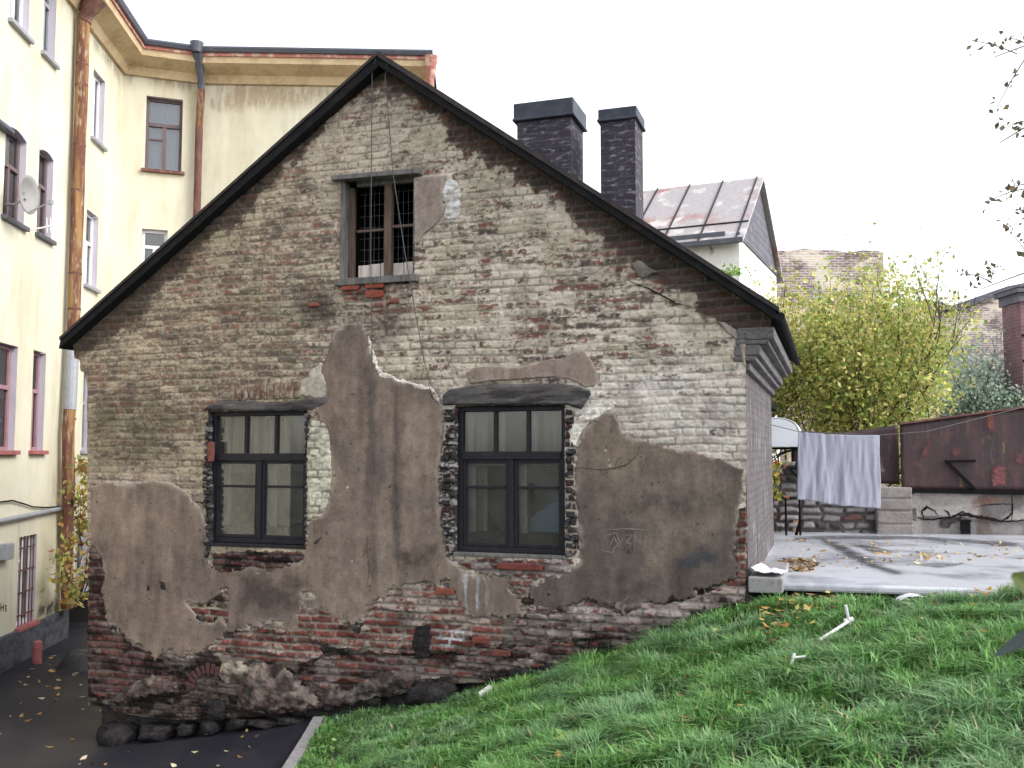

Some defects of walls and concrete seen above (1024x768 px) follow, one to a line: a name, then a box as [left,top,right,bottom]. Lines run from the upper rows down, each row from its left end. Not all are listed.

peeling [414,176,461,244]
crack [628,280,691,307]
peeling [86,321,748,697]
crack [912,493,1024,522]